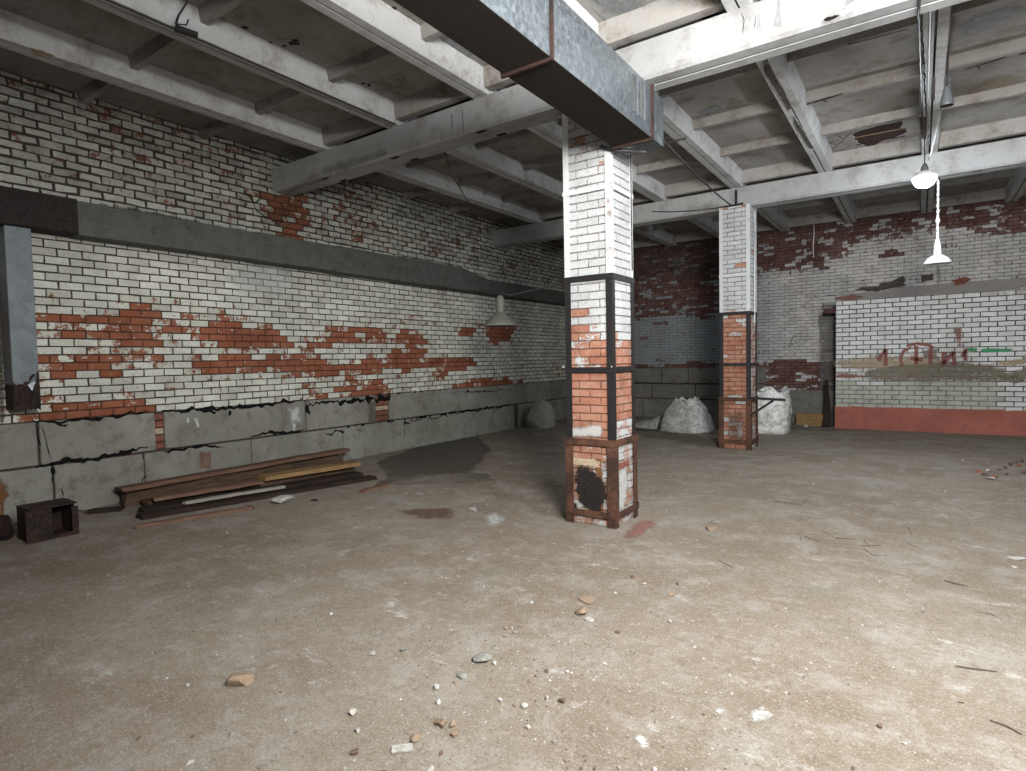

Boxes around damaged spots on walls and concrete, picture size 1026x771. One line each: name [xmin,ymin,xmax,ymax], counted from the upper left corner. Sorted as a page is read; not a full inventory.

spalling [851,115,930,147]
peeling [267,193,315,240]
peeling [757,197,1026,273]
peeling [35,302,163,379]
peeling [150,316,524,399]
peeling [562,238,835,390]
crack [32,389,513,499]